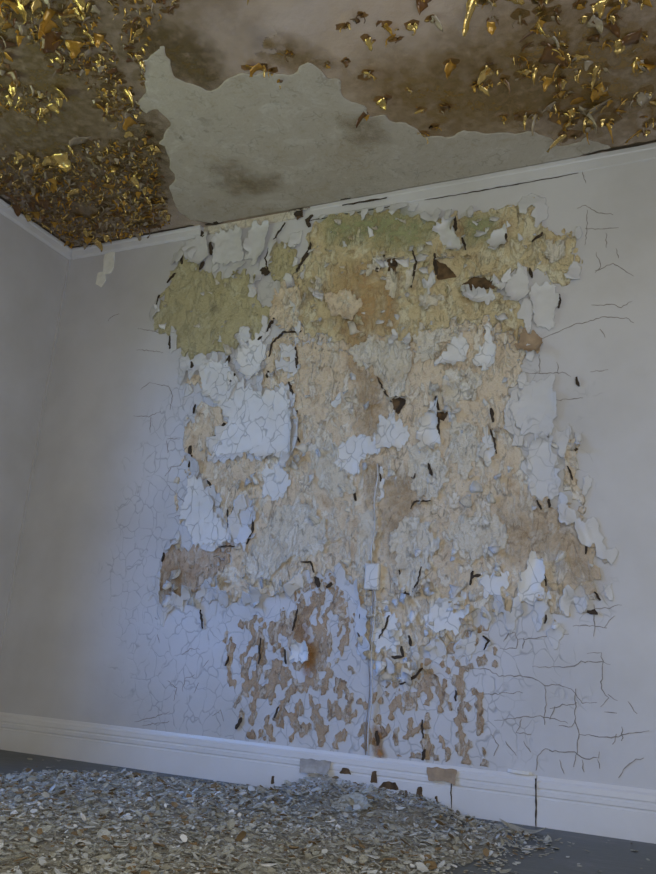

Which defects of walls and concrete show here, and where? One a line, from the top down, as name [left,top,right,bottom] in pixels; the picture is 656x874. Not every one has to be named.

damp [260,38,320,67]
damp [382,5,656,133]
flaking render [0,0,656,252]
crack [579,205,633,276]
crack [525,302,634,377]
flaking render [148,193,619,765]
crack [472,605,646,826]
peeling [300,758,351,778]
spalling [370,771,422,801]